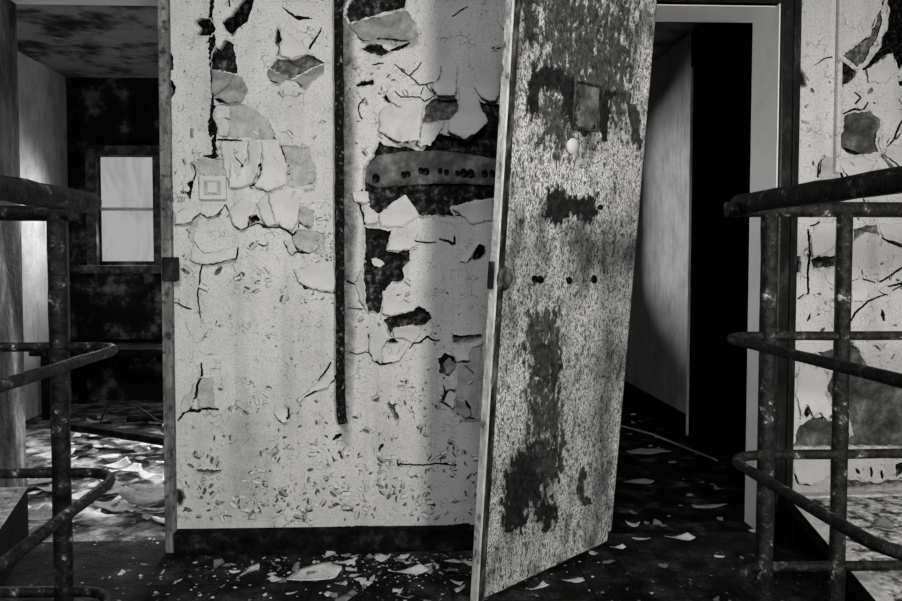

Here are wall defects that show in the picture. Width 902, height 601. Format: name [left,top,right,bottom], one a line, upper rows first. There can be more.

crack [208,0,242,159]
crack [282,7,322,49]
peeling [511,0,657,177]
flaking render [812,0,902,180]
flaking render [171,0,514,524]
peeling [538,184,599,227]
flaking render [797,217,836,321]
peeling [795,343,833,358]
peeling [498,291,572,535]
flaking render [793,365,833,486]
peeling [847,459,902,491]
flaking render [848,375,902,449]